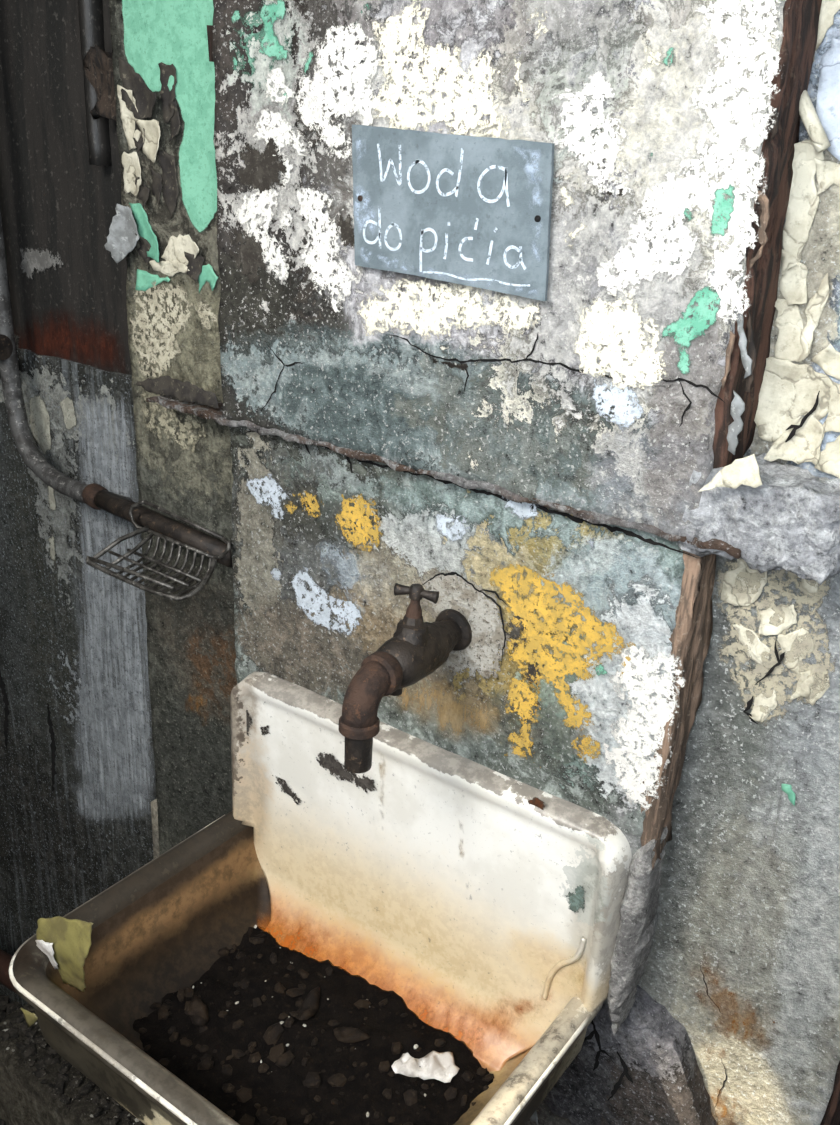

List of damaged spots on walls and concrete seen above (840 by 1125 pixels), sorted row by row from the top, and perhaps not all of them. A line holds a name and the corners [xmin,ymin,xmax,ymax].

peeling [104,0,219,453]
peeling [229,0,540,340]
peeling [551,0,786,431]
peeling [698,0,840,492]
crack [391,334,725,427]
peeling [245,473,323,520]
peeling [270,566,362,635]
peeling [334,493,383,554]
peeling [433,512,471,541]
peeling [420,560,686,811]
peeling [712,558,836,726]
peeling [272,775,305,805]